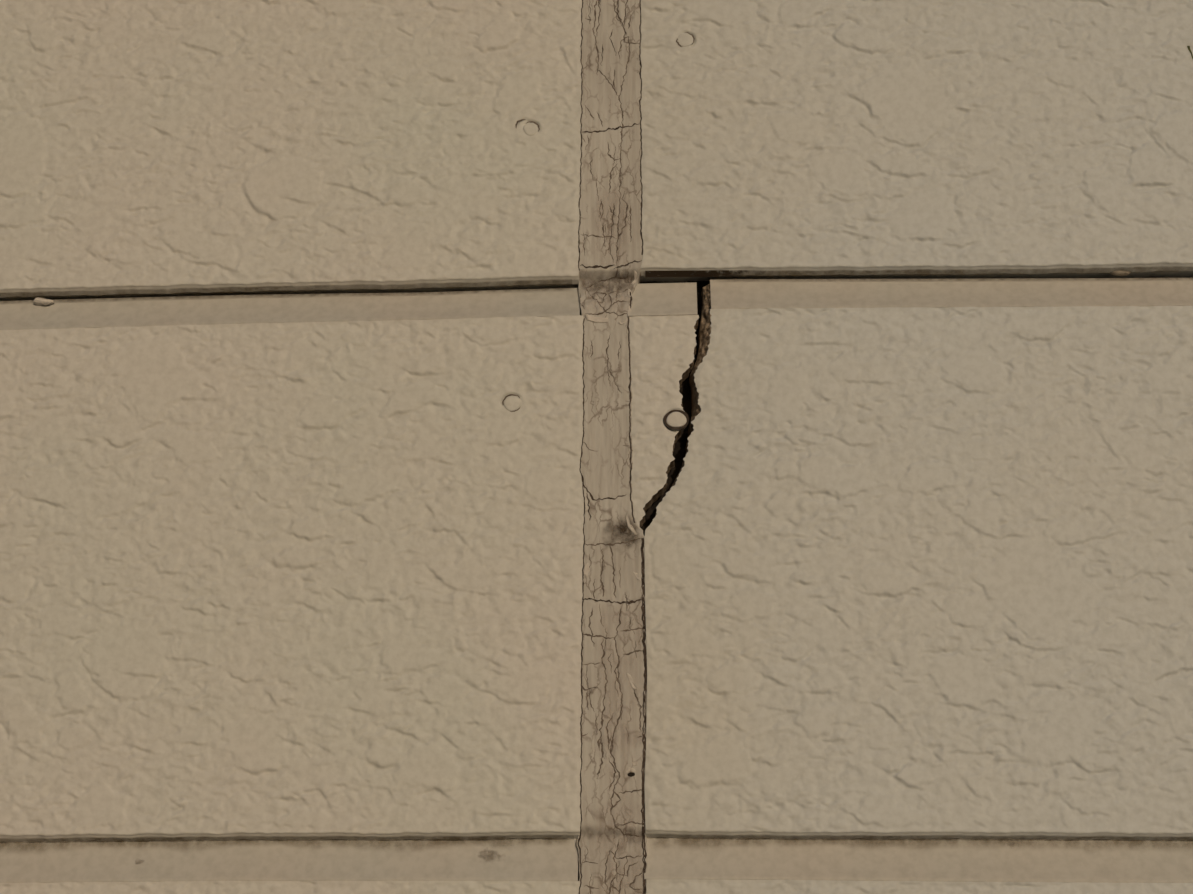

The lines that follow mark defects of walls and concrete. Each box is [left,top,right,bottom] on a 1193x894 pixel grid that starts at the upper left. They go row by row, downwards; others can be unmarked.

crack [578,0,712,894]